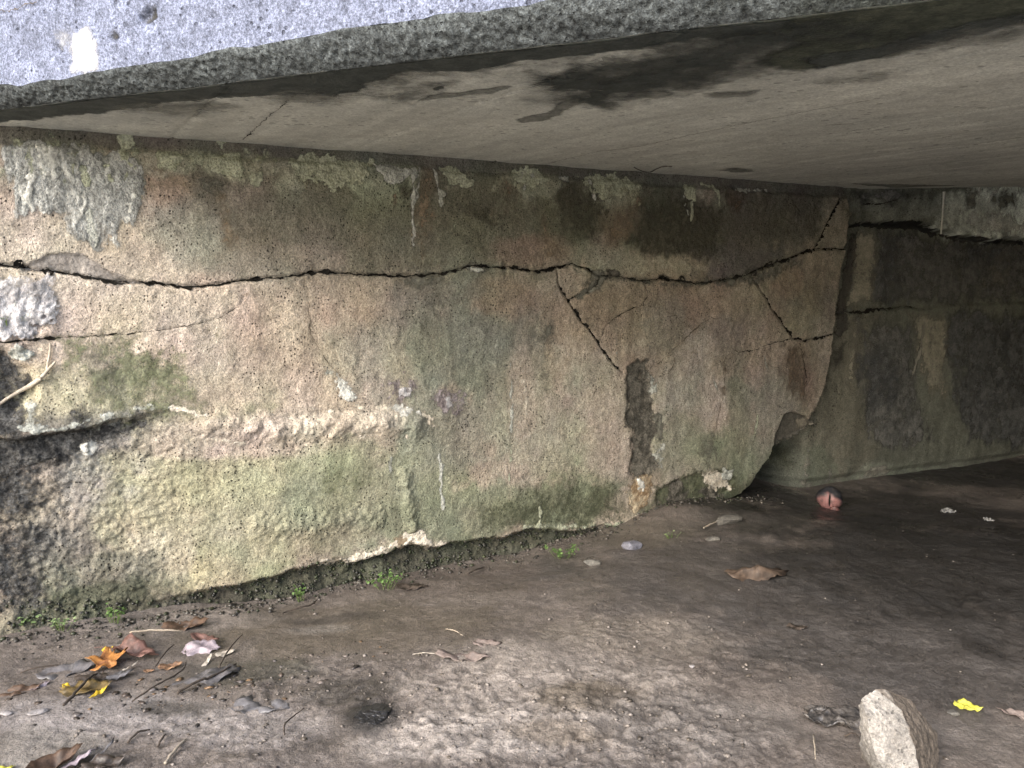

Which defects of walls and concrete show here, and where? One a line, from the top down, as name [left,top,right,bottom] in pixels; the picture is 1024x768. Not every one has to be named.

leakage [0,14,1024,123]
leakage [1,134,146,252]
leakage [155,141,475,246]
leakage [511,165,721,261]
crack [0,200,844,433]
leakage [846,187,1024,452]
leakage [17,401,114,435]
leakage [80,441,97,457]
leakage [133,404,209,418]
spalling [774,412,814,445]
leakage [317,529,453,566]
leakage [523,506,624,531]